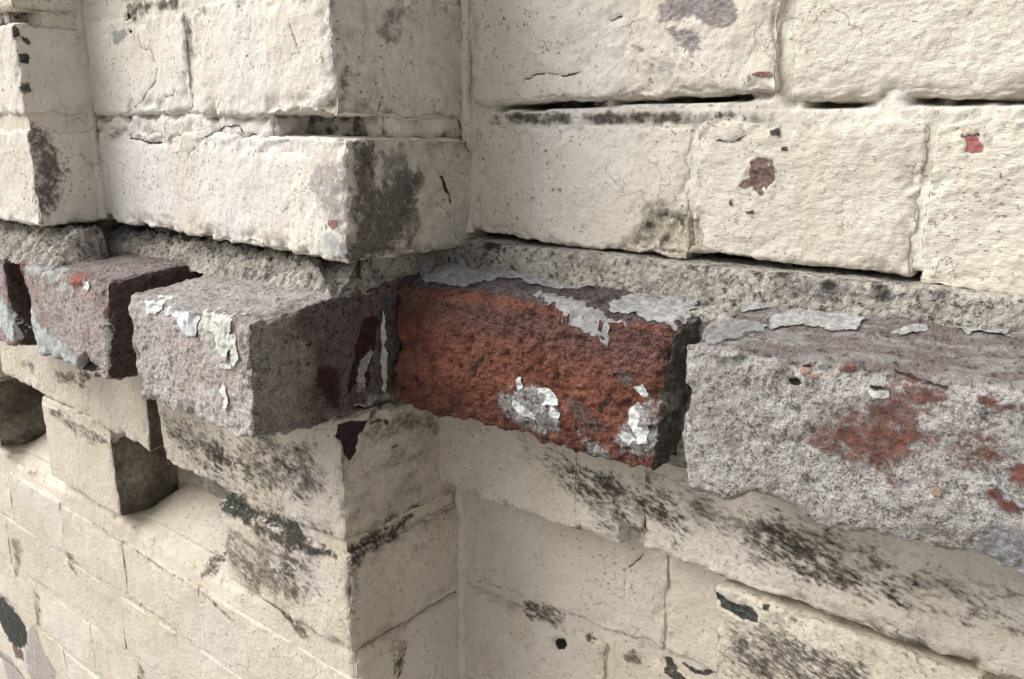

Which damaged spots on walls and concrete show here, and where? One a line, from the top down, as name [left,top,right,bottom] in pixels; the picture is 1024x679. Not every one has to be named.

crack [526,71,579,79]
crack [130,136,162,144]
crack [188,125,243,157]
crack [428,175,451,205]
peeling [144,293,296,369]
peeling [417,259,700,346]
damp [164,415,326,500]
peeling [497,377,561,441]
peeling [613,385,677,460]
damp [207,514,331,638]
damp [745,522,872,602]
damp [727,621,866,679]